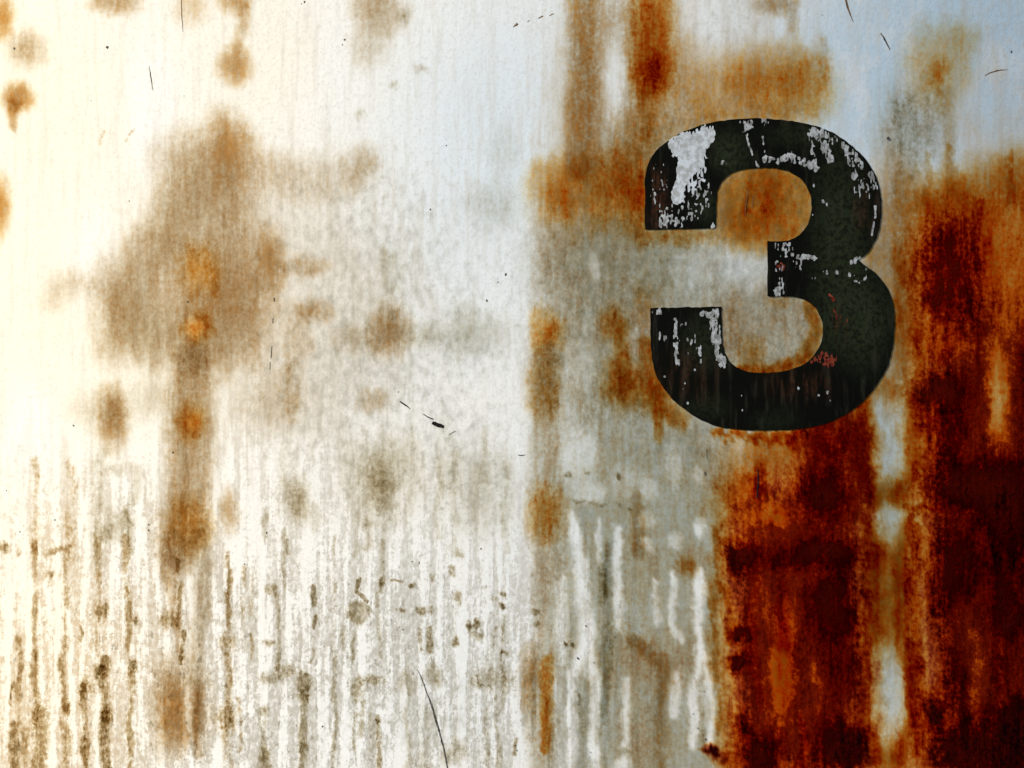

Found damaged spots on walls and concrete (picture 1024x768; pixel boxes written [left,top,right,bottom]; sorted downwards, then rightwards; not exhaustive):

corrosion [633,0,666,90]
corrosion [210,132,239,205]
corrosion [592,162,644,211]
peeling [652,124,716,228]
corrosion [725,171,809,241]
peeling [739,118,878,236]
peeling [773,242,817,296]
peeling [823,256,867,284]
peeling [659,308,726,371]
peeling [810,351,837,368]
corrosion [702,182,1024,768]
damp [80,655,110,768]